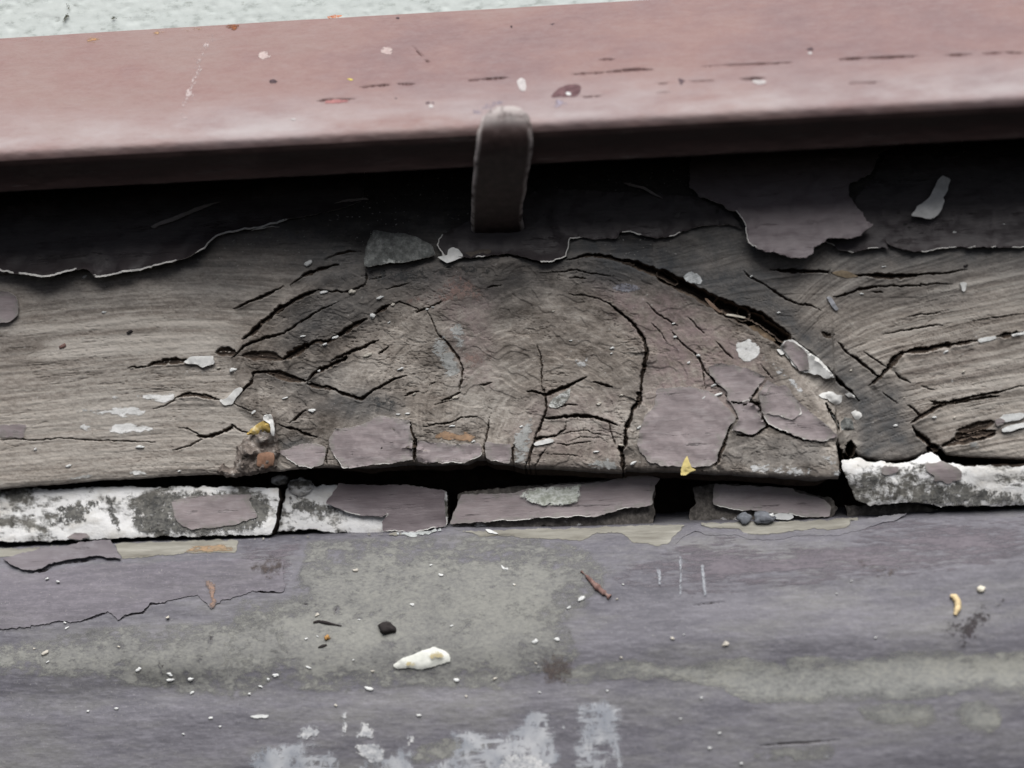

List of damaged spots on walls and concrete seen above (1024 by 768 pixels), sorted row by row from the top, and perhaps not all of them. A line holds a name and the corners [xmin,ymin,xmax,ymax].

peeling [0,173,369,277]
peeling [683,271,702,284]
peeling [364,144,1024,267]
crack [6,251,489,463]
crack [473,254,1024,474]
peeling [780,340,834,379]
peeling [0,363,1024,732]